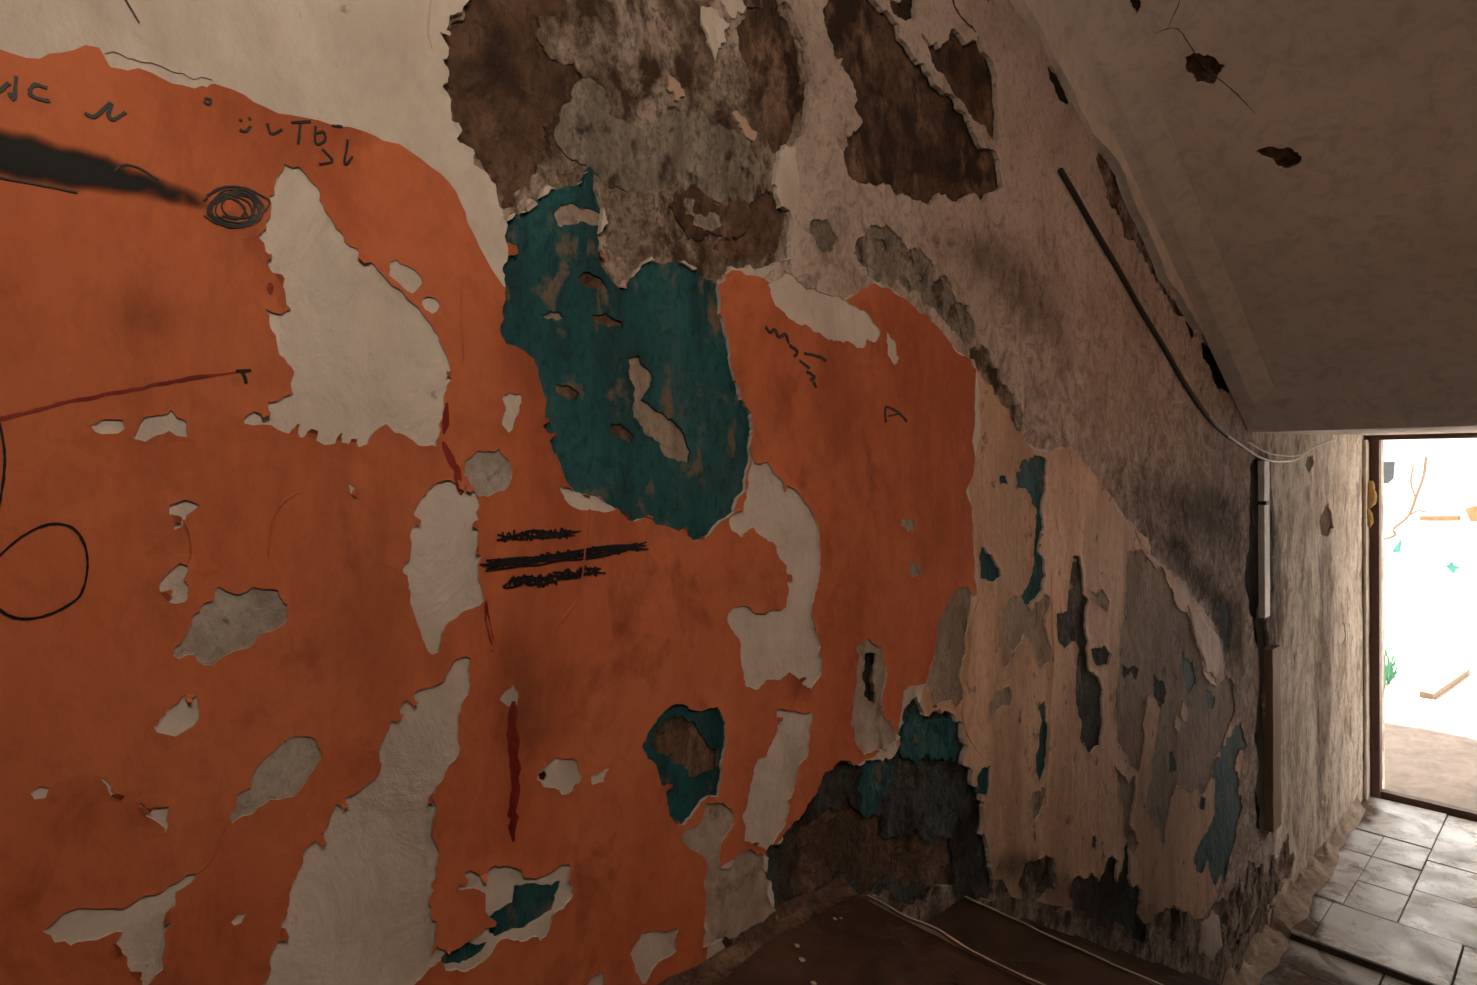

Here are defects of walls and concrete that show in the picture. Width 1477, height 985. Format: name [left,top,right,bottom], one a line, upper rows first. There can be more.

flaking render [823,0,997,207]
spalling [1257,146,1302,168]
peeling [244,165,453,447]
flaking render [442,0,898,689]
flaking render [854,225,1022,432]
flaking render [155,563,287,665]
flaking render [230,736,321,822]
peeling [263,656,572,985]
peeling [403,449,511,654]
peeling [537,758,608,794]
flaking render [642,547,1000,946]
peeling [998,456,1292,962]